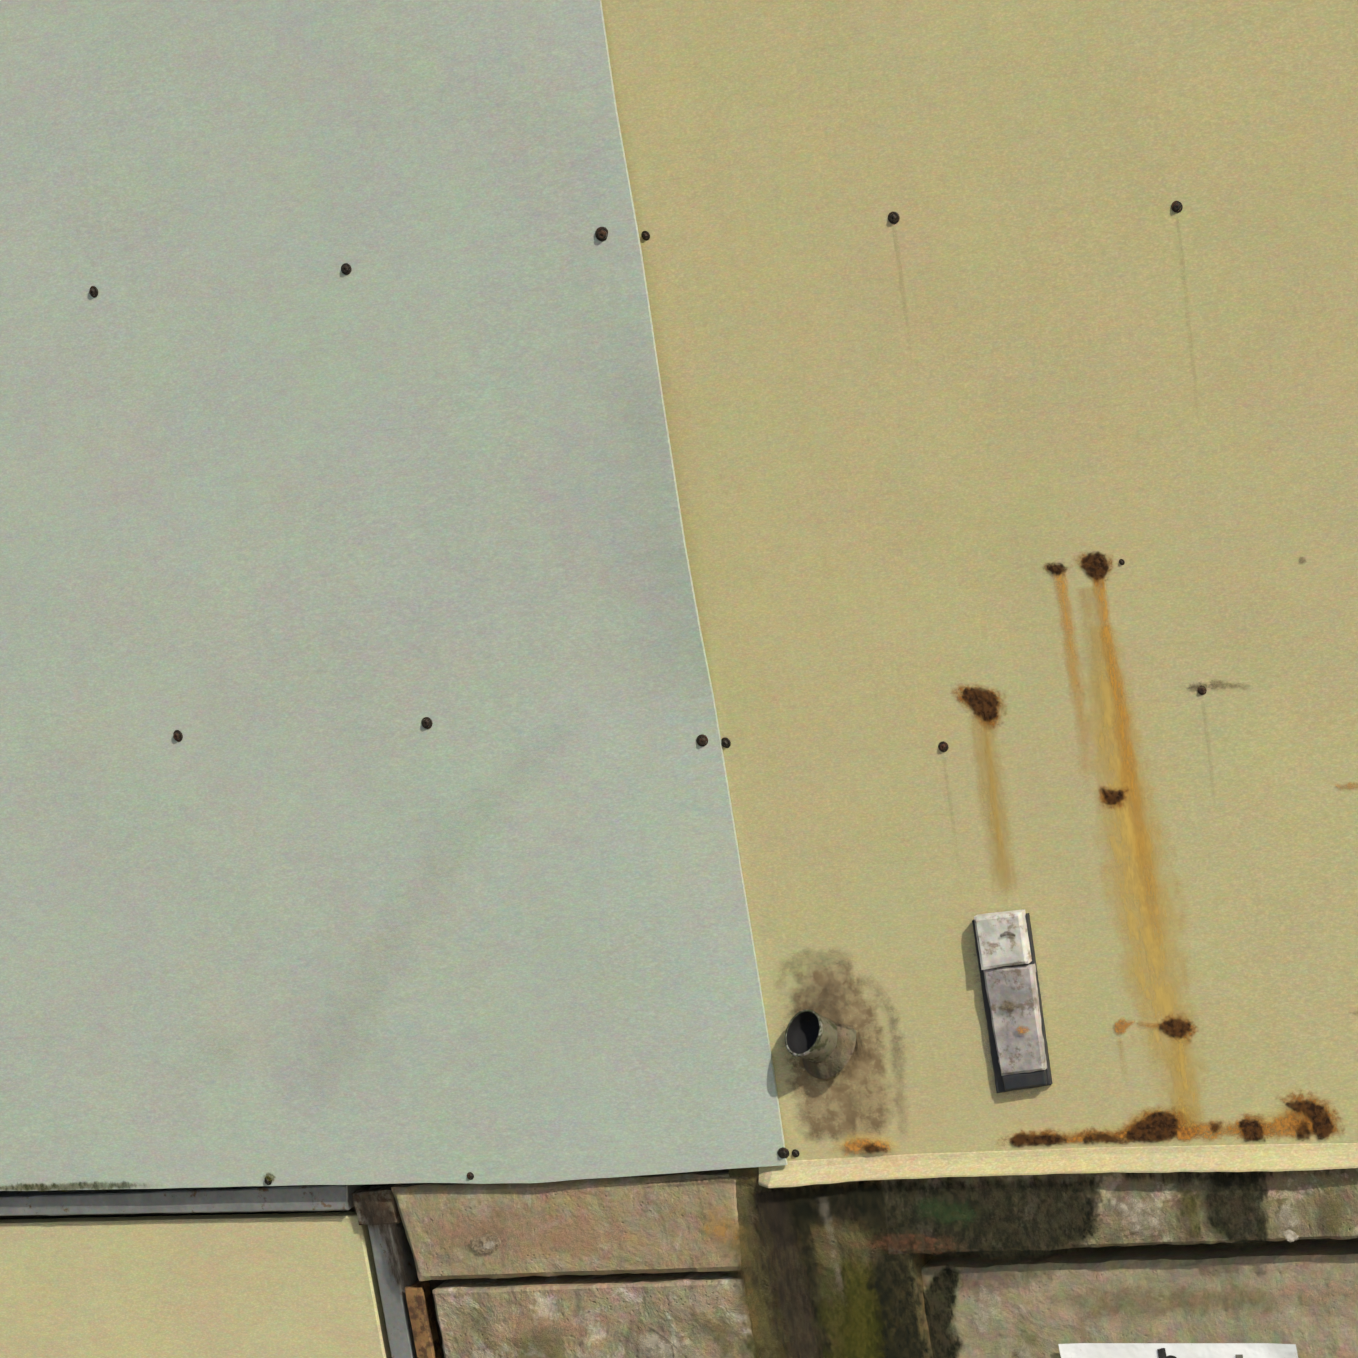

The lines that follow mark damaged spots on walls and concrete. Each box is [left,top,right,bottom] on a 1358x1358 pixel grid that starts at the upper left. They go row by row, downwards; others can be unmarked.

rust [955,686,1002,757]
rust [1046,552,1195,1089]
rust [845,1138,890,1154]
rust [1011,1094,1339,1147]
water stain [706,1178,1102,1358]